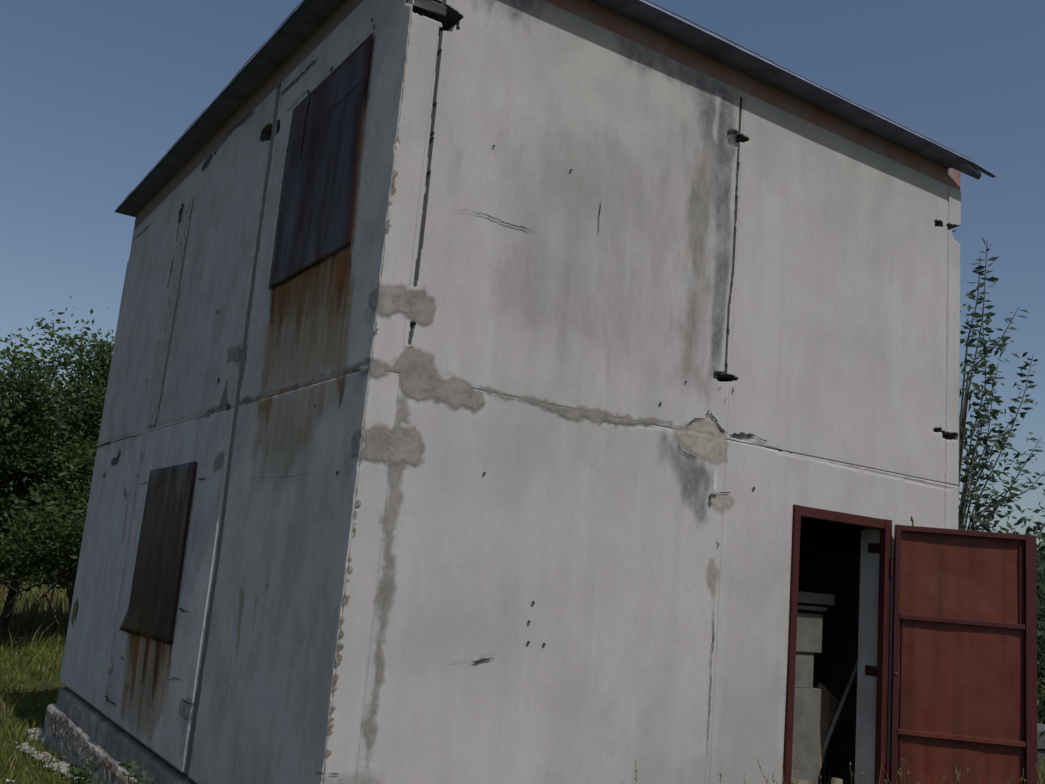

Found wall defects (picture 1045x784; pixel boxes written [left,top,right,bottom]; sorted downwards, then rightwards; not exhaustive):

water stain [698,79,735,236]
corrosion [264,249,353,403]
water stain [712,251,729,360]
water stain [676,457,717,515]
corrosion [124,634,172,719]
spalling [332,595,348,691]